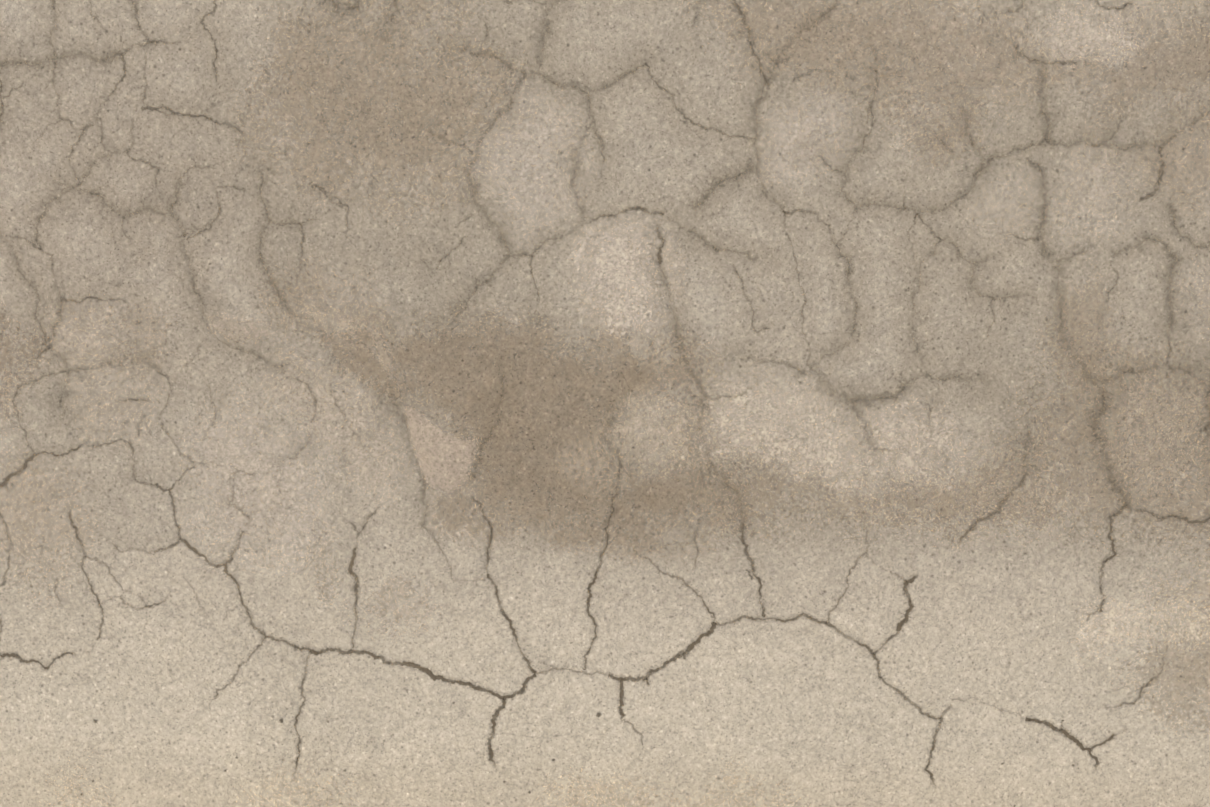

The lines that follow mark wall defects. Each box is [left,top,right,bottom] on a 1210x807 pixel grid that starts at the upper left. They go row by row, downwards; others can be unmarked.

leakage [241,0,585,222]
crack [608,207,665,264]
leakage [267,283,1210,558]
crack [0,445,81,487]
crack [69,513,81,542]
crack [960,474,1026,541]
crack [1100,505,1128,612]
crack [1156,515,1210,523]
crack [0,580,103,670]
crack [156,483,536,768]
crack [584,507,942,781]
crack [1025,717,1115,766]